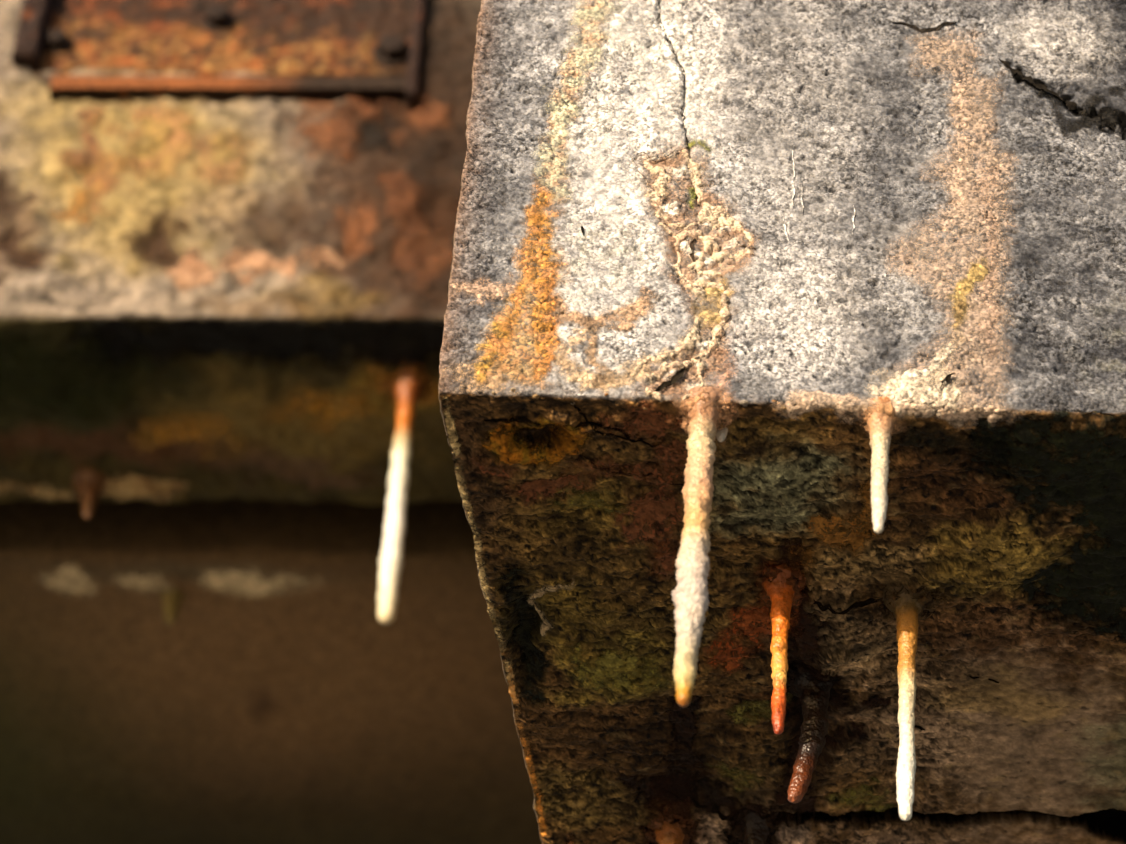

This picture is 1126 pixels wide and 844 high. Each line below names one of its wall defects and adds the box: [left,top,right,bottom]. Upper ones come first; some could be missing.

crack [892,22,956,32]
crack [631,0,756,250]
crack [999,58,1126,140]
corrosion [475,185,566,383]
corrosion [474,400,688,582]
water stain [785,346,1126,643]
corrosion [705,604,773,673]
corrosion [774,480,876,671]
crack [666,792,732,821]
corrosion [619,694,891,827]
crack [775,806,1126,844]